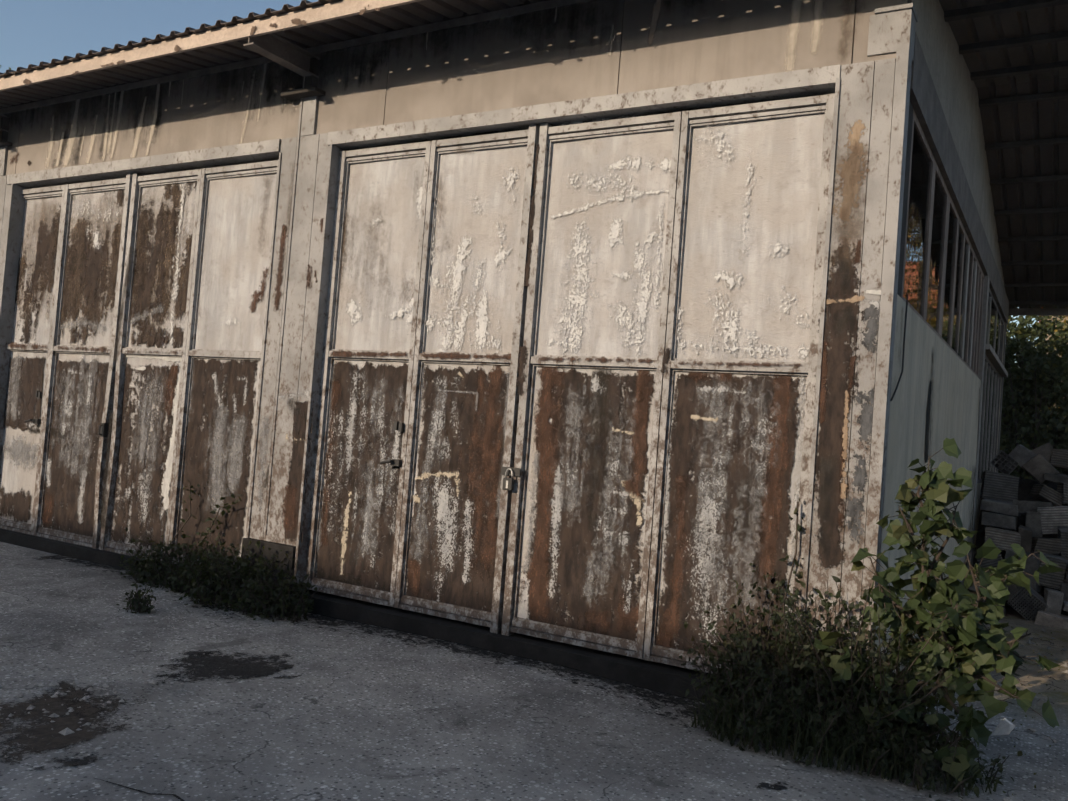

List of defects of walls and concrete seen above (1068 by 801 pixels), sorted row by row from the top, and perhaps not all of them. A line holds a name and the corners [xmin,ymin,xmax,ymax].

damp [812,0,824,53]
damp [46,90,124,167]
damp [132,80,184,158]
peeling [561,114,656,126]
corrosion [0,181,269,564]
peeling [426,199,511,353]
peeling [546,154,671,358]
peeling [677,270,809,361]
corrosion [814,120,869,568]
corrosion [316,350,408,592]
corrosion [405,346,801,666]
crack [100,779,185,801]